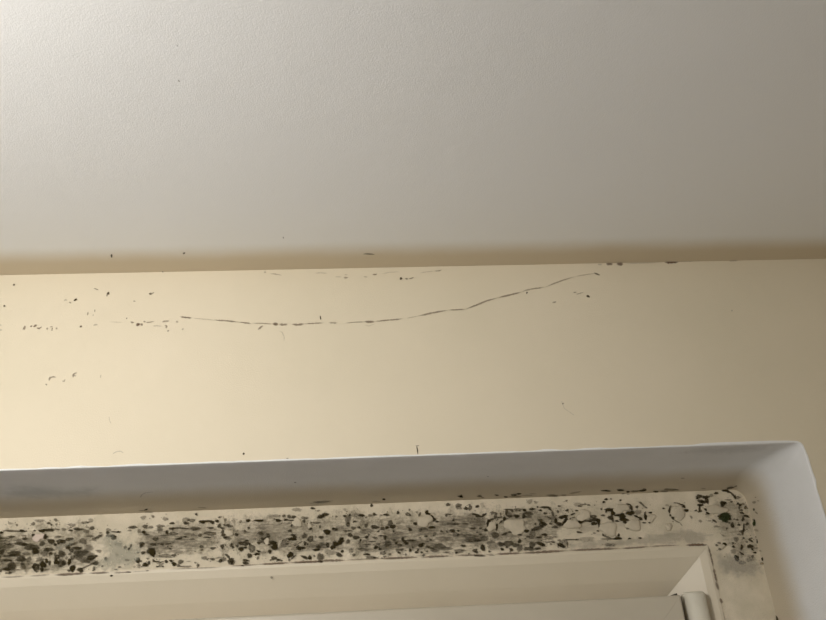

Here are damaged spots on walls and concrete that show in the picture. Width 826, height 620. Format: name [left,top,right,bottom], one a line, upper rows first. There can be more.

damp [0,489,658,577]
damp [662,487,763,562]